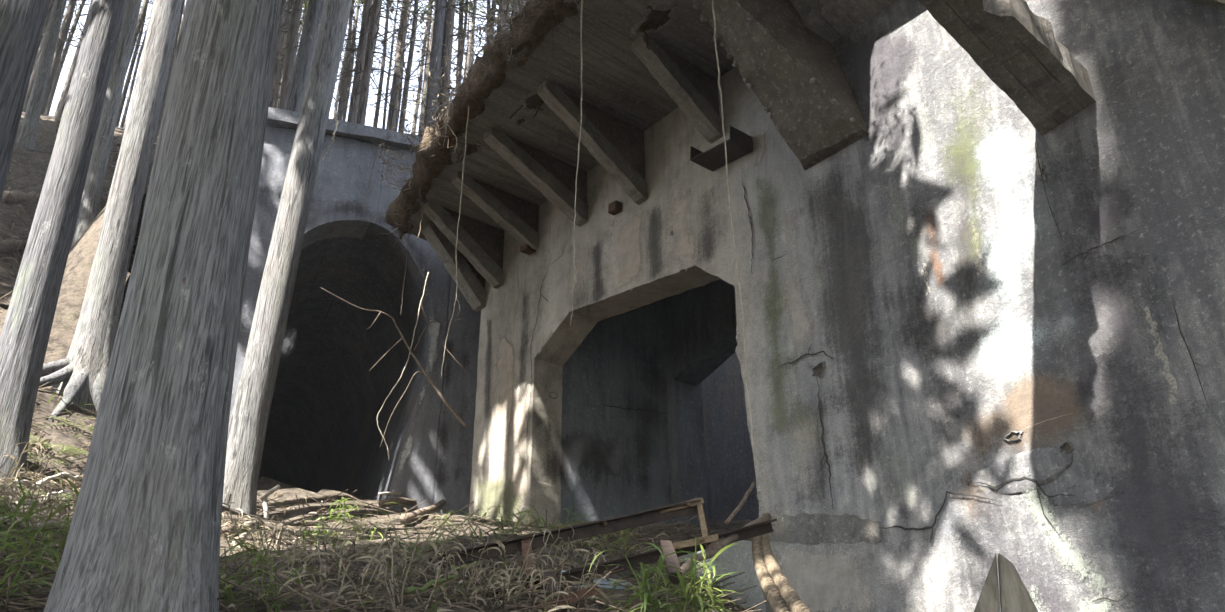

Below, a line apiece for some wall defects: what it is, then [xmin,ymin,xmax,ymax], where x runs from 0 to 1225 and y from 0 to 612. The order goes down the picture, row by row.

water stain [833,30,914,146]
crack [1035,144,1138,266]
crack [779,344,834,510]
water stain [782,126,1076,474]
water stain [1040,162,1225,612]
crack [1172,297,1208,405]
crack [884,477,1072,542]
water stain [960,546,1068,612]